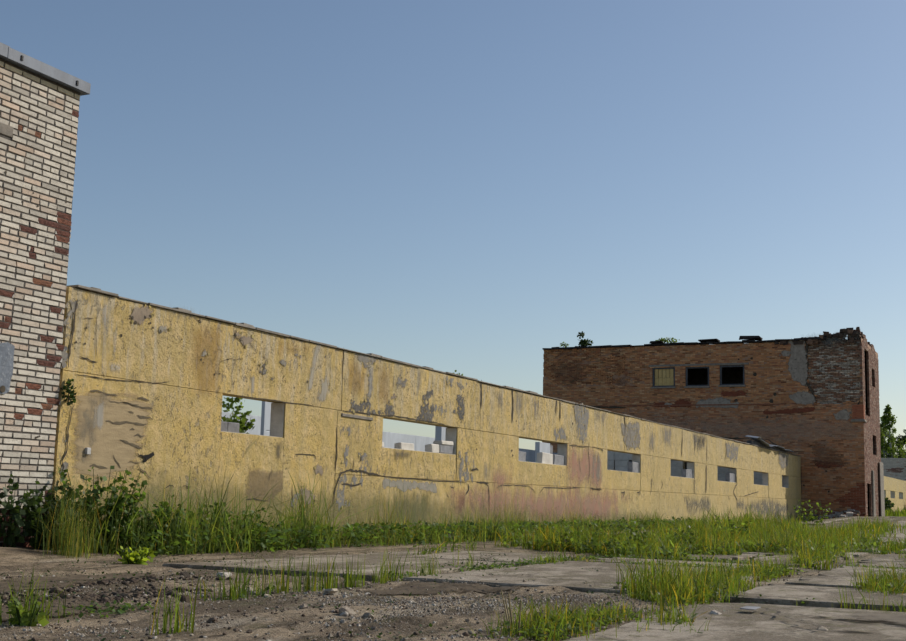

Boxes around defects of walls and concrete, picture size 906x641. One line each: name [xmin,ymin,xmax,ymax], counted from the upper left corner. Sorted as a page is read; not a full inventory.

spalling [90,390,154,478]
peeling [349,354,407,417]
crack [344,411,453,427]
peeling [415,376,467,422]
crack [591,406,626,430]
peeling [621,421,641,450]
spalling [762,339,862,419]
peeling [336,426,372,512]
peeling [383,478,437,494]
crack [295,443,663,506]